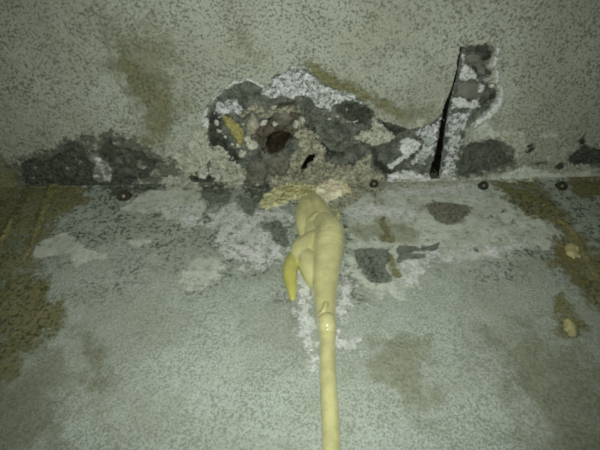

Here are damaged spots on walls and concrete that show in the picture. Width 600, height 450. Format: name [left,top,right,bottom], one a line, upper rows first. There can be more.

damp [0,56,329,203]
spalling [189,42,508,219]
crack [429,46,462,178]
spalling [12,138,165,185]
peeling [263,220,289,247]
peeling [355,248,392,284]
peeling [396,243,439,263]
peeling [426,200,470,225]